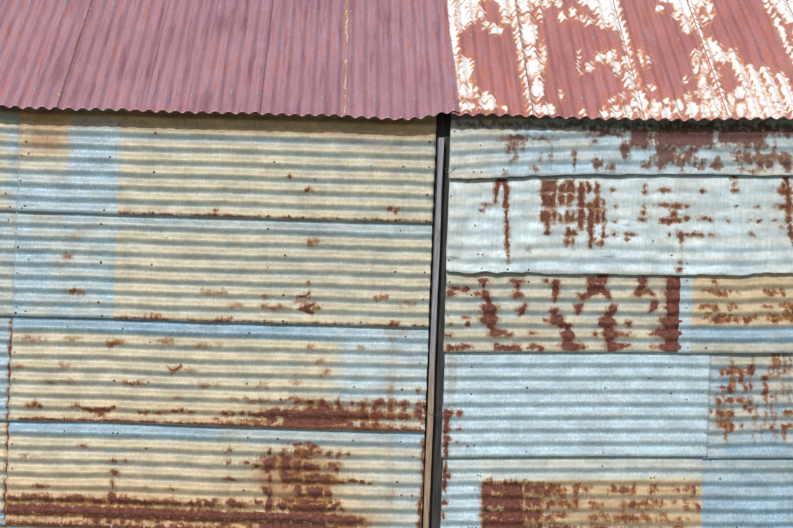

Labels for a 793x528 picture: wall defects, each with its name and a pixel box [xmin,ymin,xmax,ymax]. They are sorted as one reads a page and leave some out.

peeling [447,0,793,120]
rust [479,169,510,262]
rust [540,179,635,248]
rust [589,126,793,244]
rust [445,278,544,352]
rust [543,278,586,351]
rust [573,275,632,352]
rust [632,261,682,352]
rust [2,319,425,528]
rust [710,364,774,431]
rust [479,479,588,528]
rust [589,484,689,528]